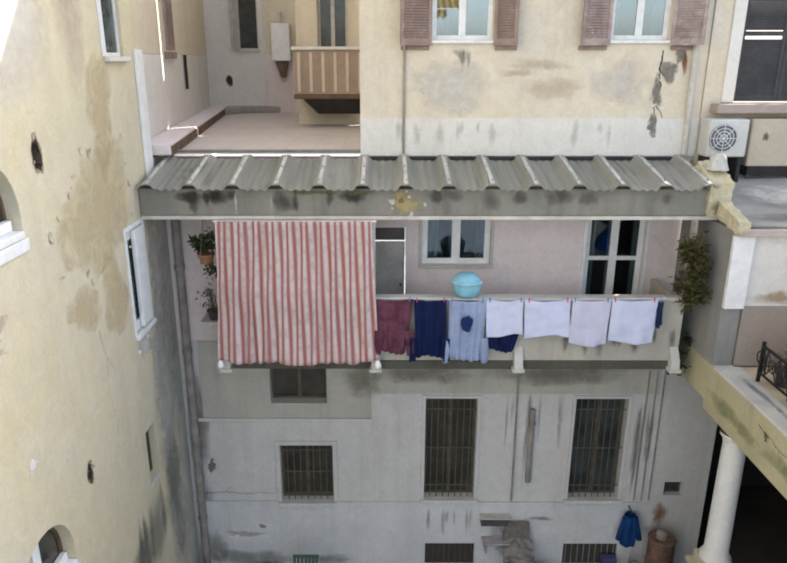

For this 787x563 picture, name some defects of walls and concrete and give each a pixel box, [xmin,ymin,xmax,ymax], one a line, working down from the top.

crack [649,50,669,118]
spalling [30,132,44,174]
spalling [388,190,426,216]
spalling [87,460,95,485]